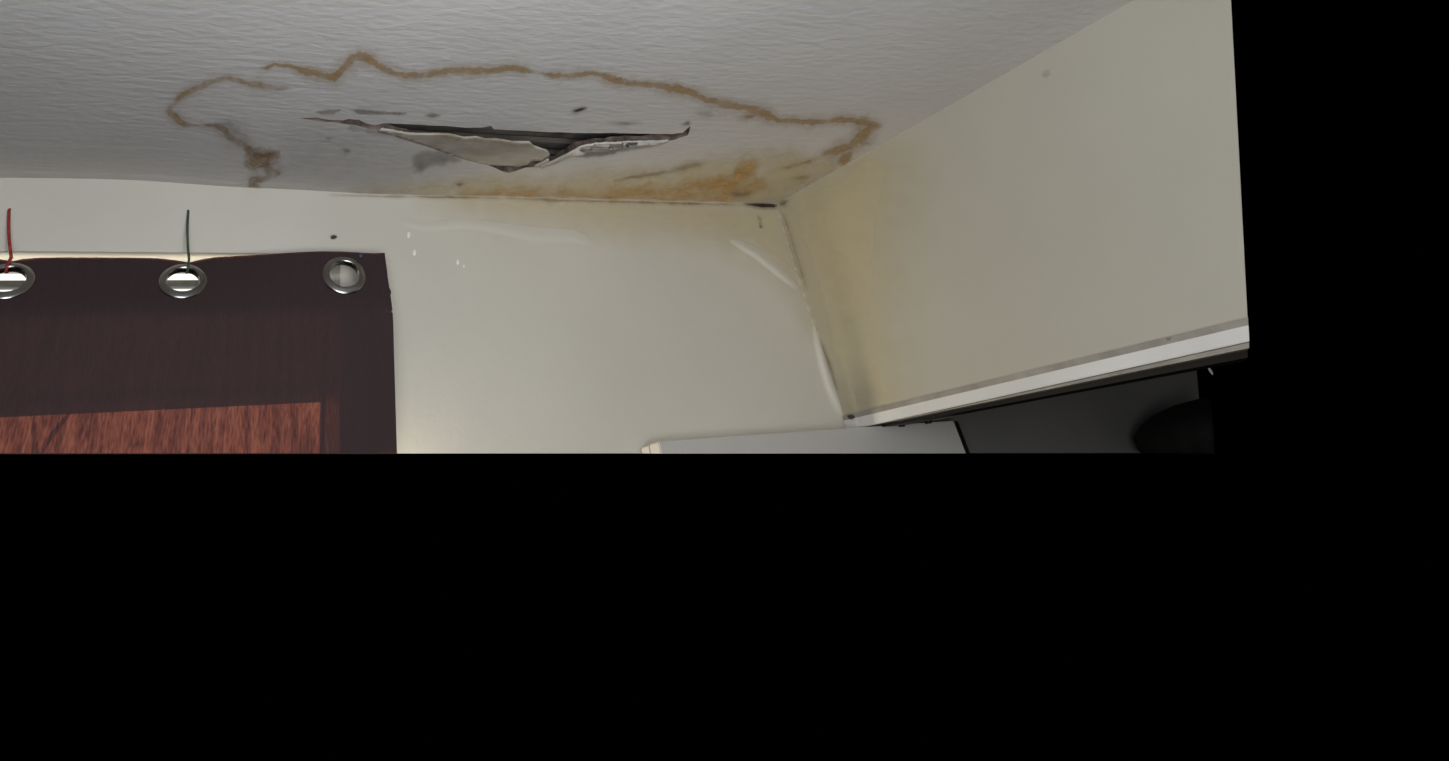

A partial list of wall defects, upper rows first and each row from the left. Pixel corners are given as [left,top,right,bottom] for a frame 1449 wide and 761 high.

water stain [243,53,529,87]
water stain [245,148,278,187]
peeling [355,110,670,169]
water stain [463,71,875,202]